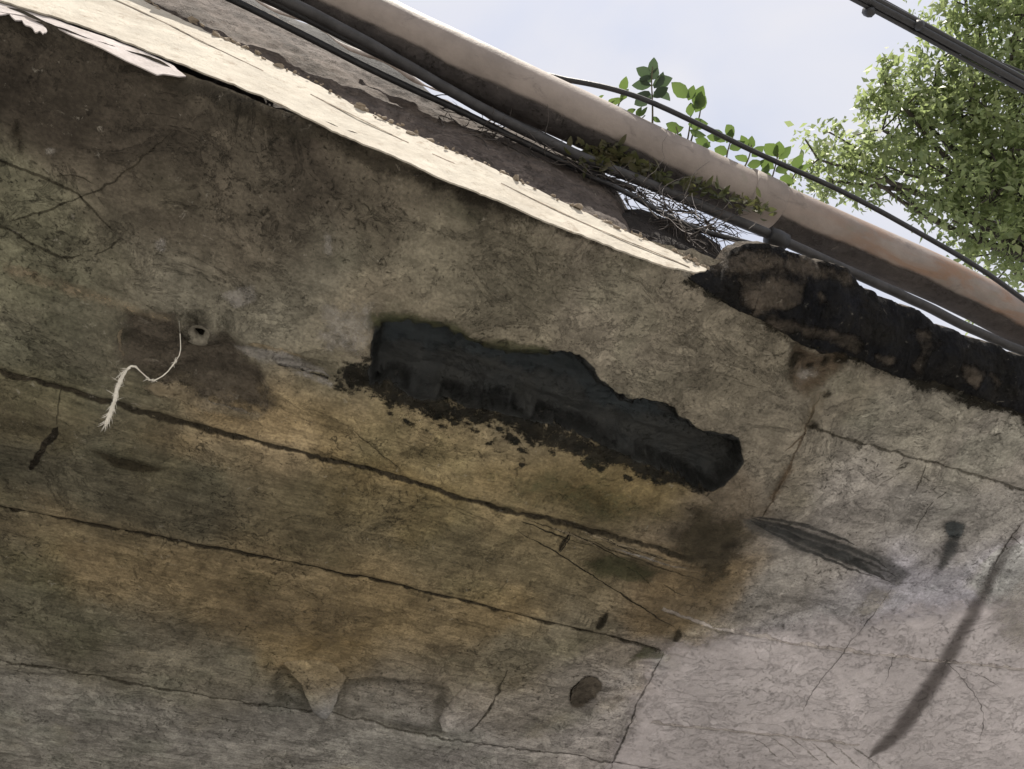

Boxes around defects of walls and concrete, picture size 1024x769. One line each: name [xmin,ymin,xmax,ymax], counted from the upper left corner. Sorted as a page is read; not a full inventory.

flaking render [0,2,186,77]
spalling [187,16,537,190]
crack [0,129,175,259]
spalling [550,194,710,275]
spalling [117,311,744,496]
crack [758,389,823,521]
crack [915,466,946,531]
crack [517,521,705,633]
crack [612,652,664,762]
leakage [606,509,1024,769]
crack [803,590,891,710]
crack [949,665,999,741]